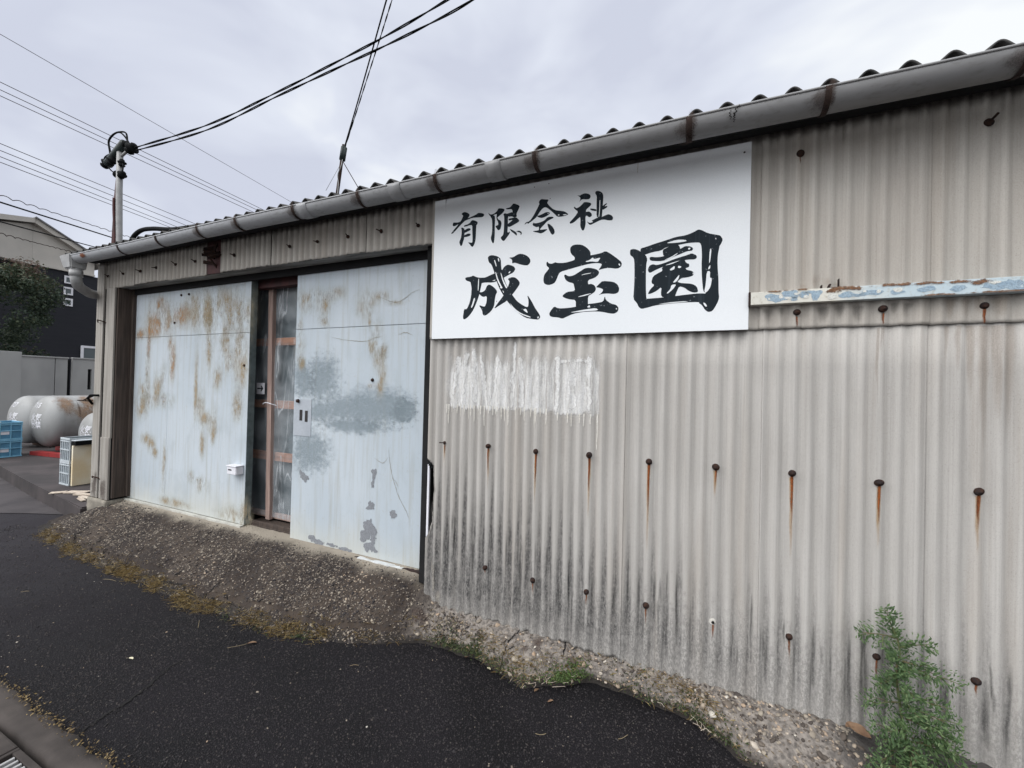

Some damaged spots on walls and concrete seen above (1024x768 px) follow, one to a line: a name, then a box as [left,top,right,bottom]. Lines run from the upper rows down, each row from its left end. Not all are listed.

peeling [765,285,936,303]
peeling [982,279,1024,290]
rust [138,295,249,382]
peeling [308,501,378,553]